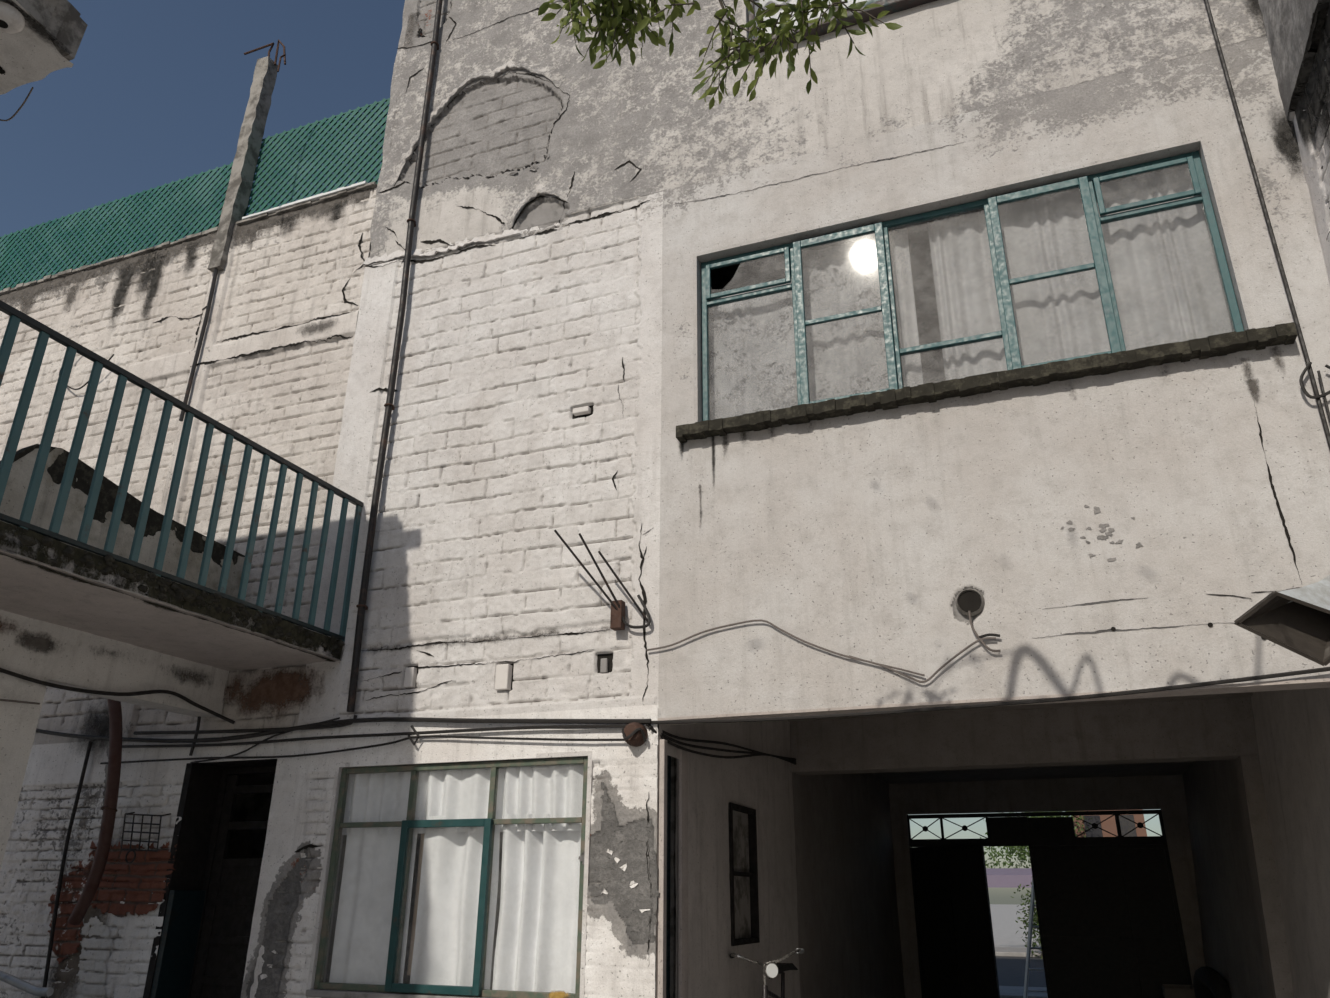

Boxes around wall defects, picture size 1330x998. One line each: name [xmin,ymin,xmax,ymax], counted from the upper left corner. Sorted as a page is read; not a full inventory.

spalling [386,60,575,233]
crack [453,0,562,40]
leakage [1272,0,1330,171]
leakage [0,189,370,320]
crack [1038,379,1302,638]
mould [0,521,345,662]
peeling [48,841,177,964]
peeling [246,844,321,998]
peeling [578,782,659,966]